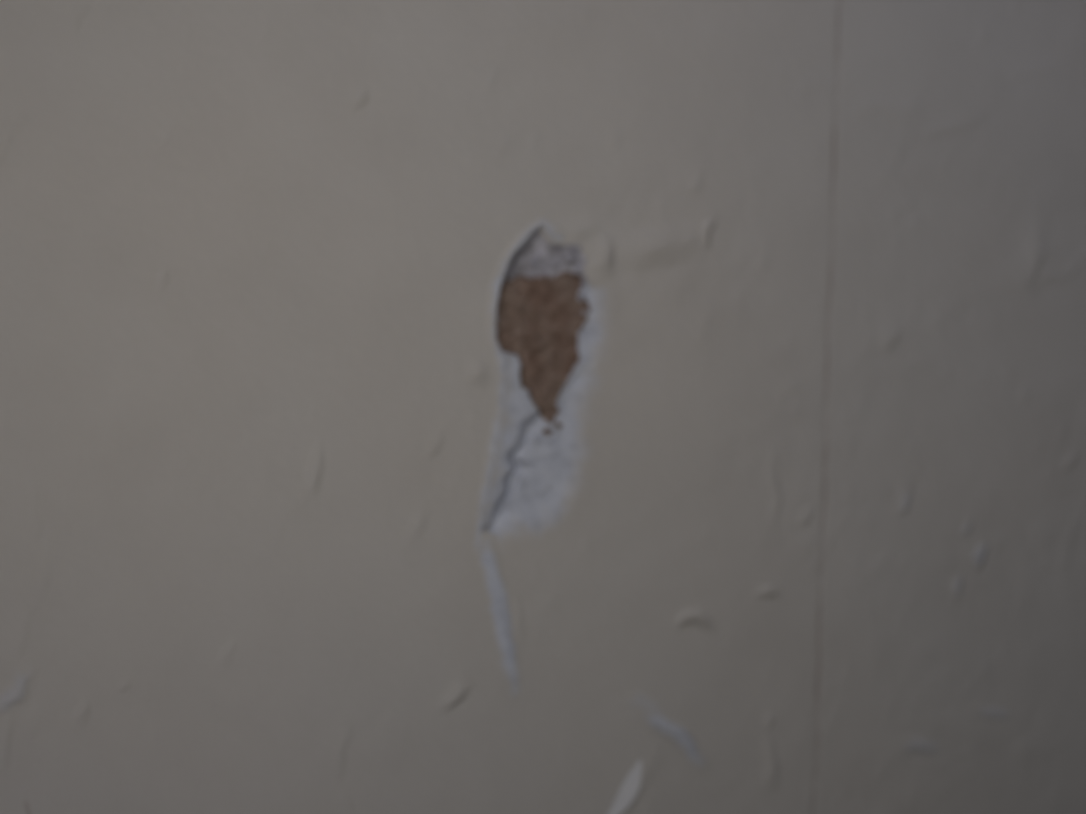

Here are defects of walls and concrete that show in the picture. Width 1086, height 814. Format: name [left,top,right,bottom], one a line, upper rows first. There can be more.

flaking render [460,206,624,573]
peeling [607,759,642,814]